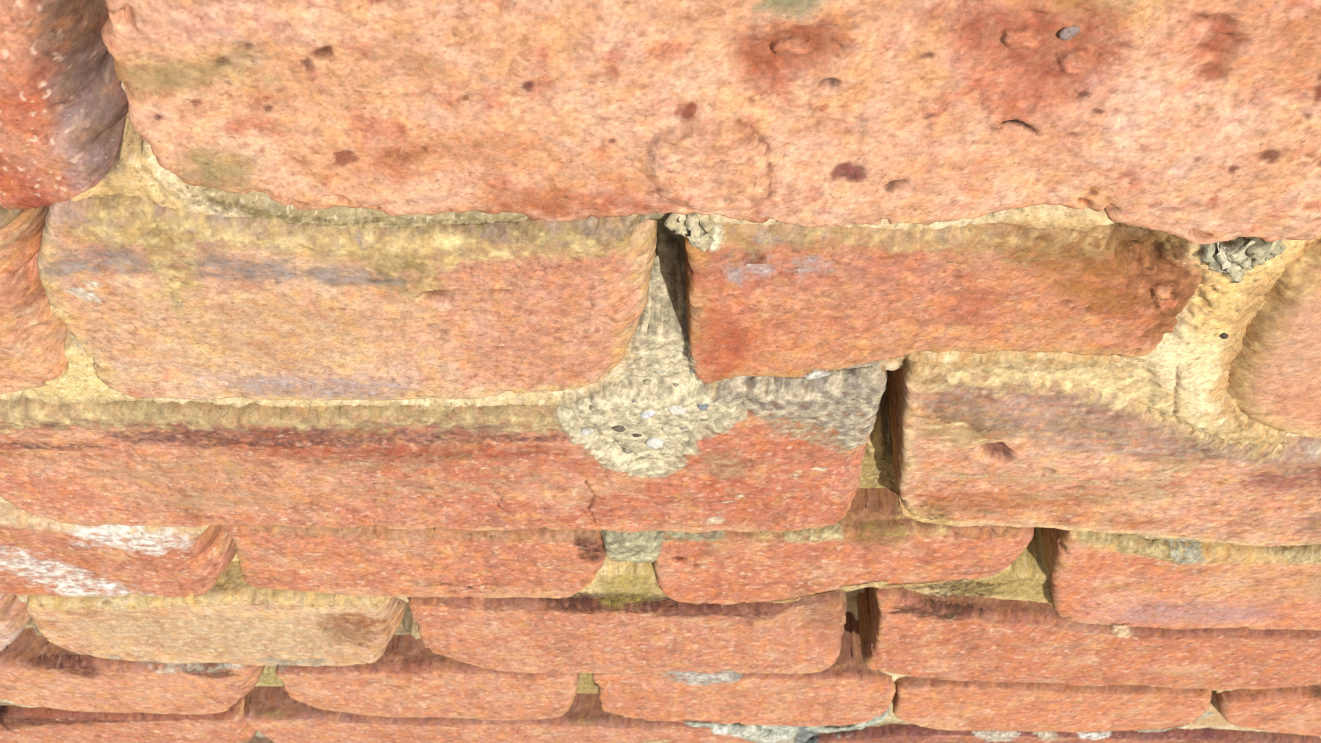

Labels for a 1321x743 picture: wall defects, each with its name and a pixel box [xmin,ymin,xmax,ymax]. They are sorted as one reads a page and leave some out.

water stain [73,524,191,555]
water stain [0,546,130,596]
water stain [143,661,241,678]